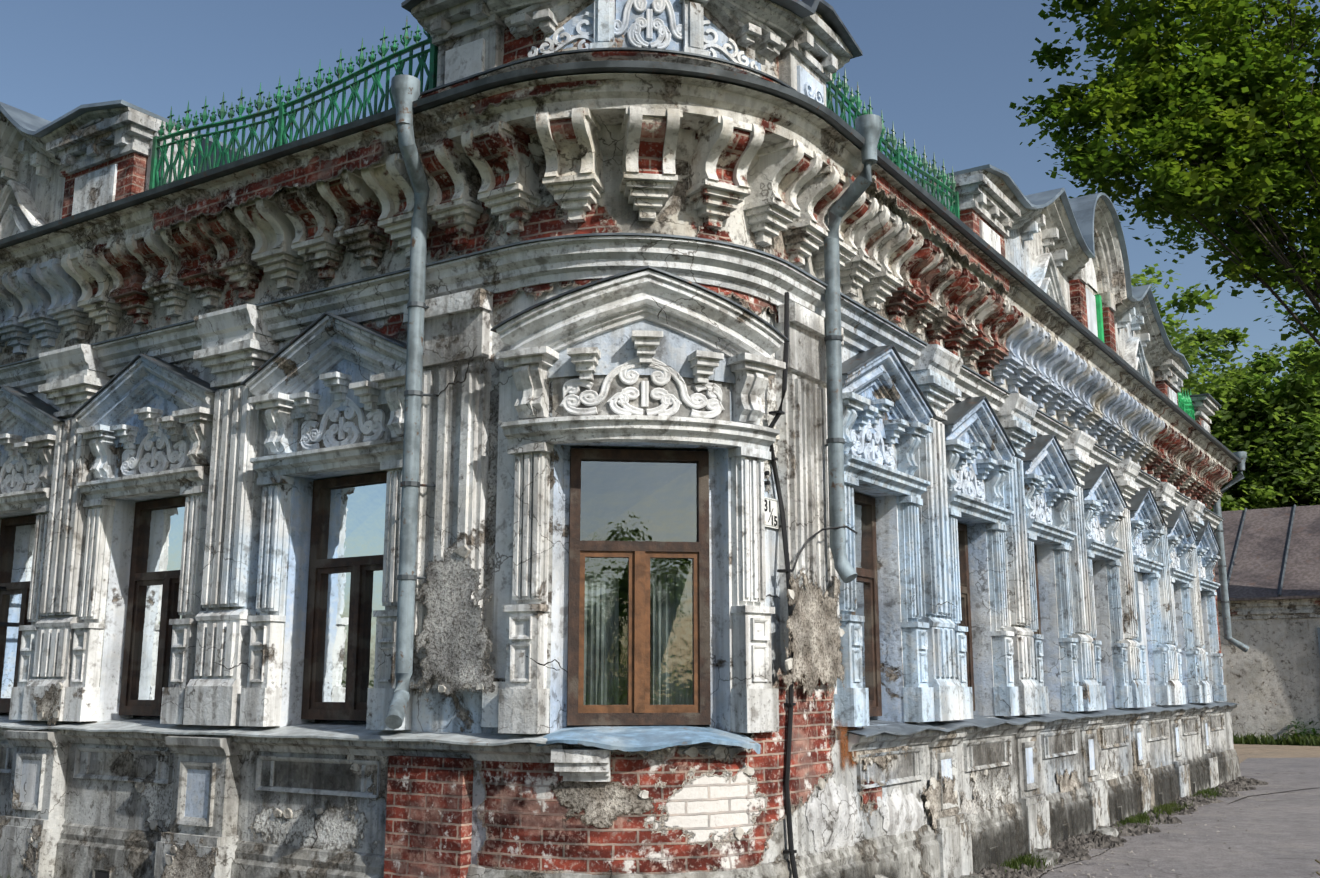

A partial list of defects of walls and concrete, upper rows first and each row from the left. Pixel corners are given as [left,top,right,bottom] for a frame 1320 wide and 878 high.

flaking render [151,138,385,231]
flaking render [427,201,623,260]
flaking render [872,169,1010,293]
flaking render [493,279,600,319]
flaking render [697,283,779,323]
flaking render [409,382,505,703]
flaking render [476,568,912,875]
peeling [249,754,388,853]
water stain [819,864,898,878]
water stain [972,817,1029,874]
water stain [1049,799,1093,843]
water stain [1108,750,1227,823]